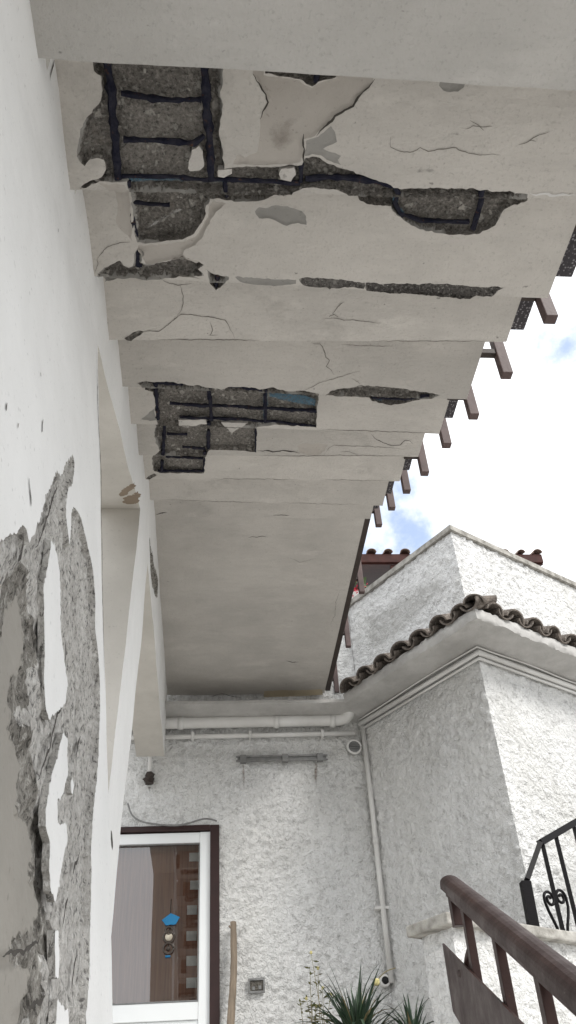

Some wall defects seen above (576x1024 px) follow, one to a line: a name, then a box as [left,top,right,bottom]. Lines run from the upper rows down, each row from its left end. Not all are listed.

spalling [77,62,573,290]
crack [390,121,495,155]
crack [122,271,235,338]
crack [302,303,392,392]
spalling [119,381,440,504]
flaking render [0,454,100,1024]